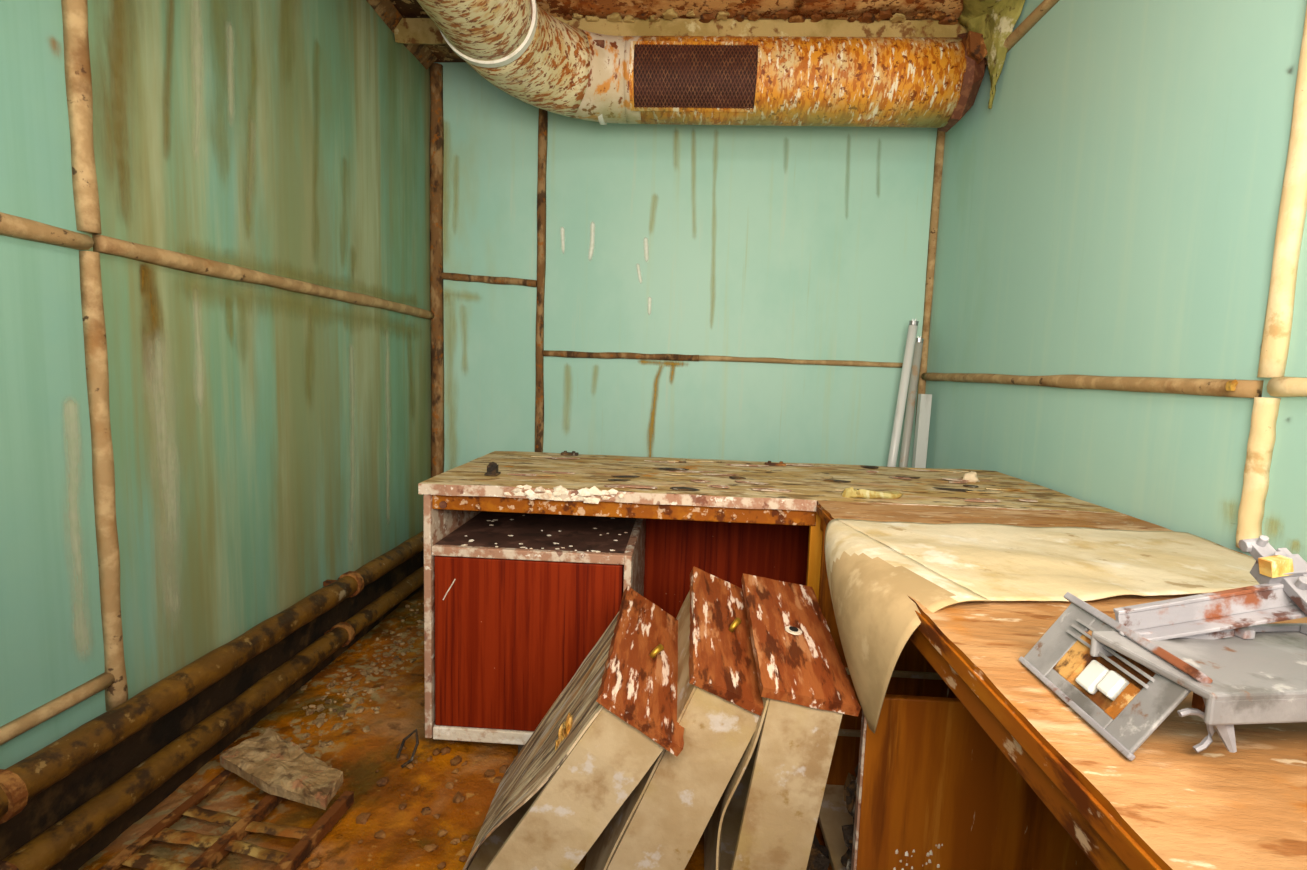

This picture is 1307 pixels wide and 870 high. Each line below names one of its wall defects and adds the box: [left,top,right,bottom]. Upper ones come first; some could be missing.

water stain [165,0,173,146]
peeling [563,0,1025,109]
rust [727,0,933,20]